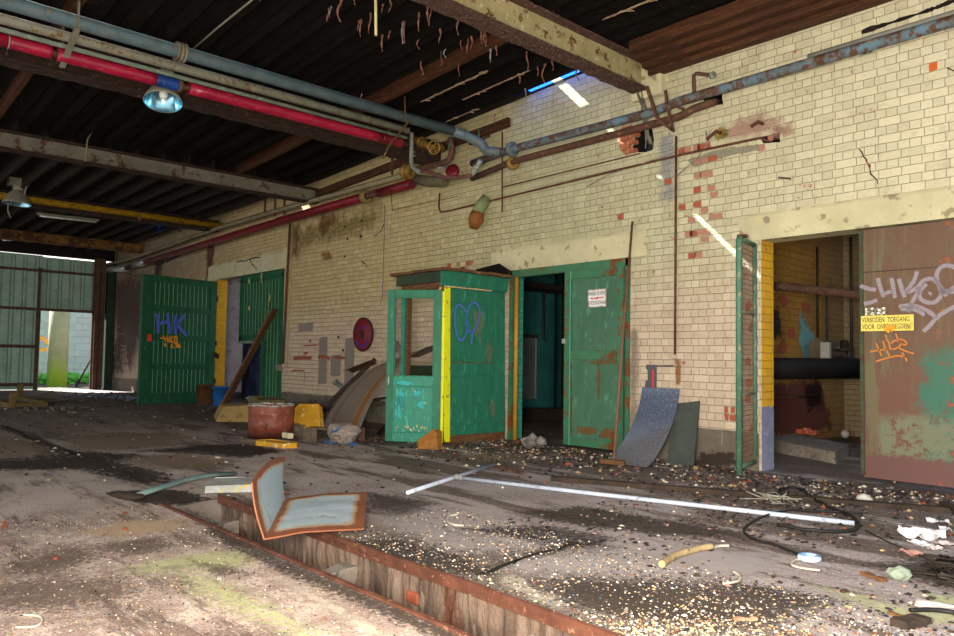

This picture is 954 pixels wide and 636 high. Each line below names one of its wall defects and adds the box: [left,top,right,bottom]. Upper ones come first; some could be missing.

spalling [618,125,640,155]
crack [859,149,878,184]
peeling [678,142,723,259]
leakage [296,211,375,251]
peeling [724,406,736,421]
leakage [0,432,235,470]
peeling [358,425,954,552]